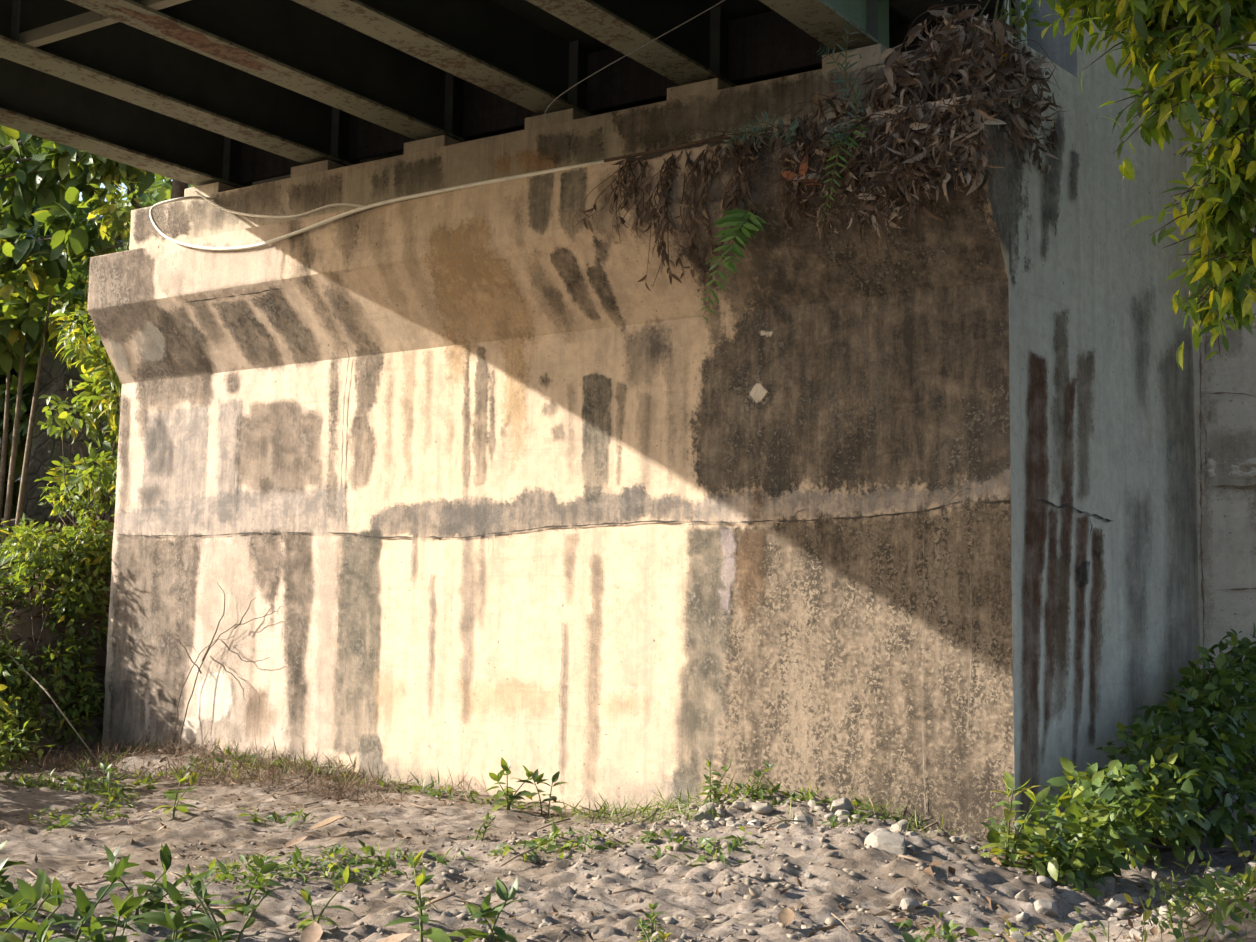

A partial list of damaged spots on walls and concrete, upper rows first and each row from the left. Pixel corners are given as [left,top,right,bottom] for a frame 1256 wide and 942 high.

water stain [133,175,342,244]
water stain [372,157,442,191]
water stain [516,127,603,233]
water stain [291,235,359,333]
water stain [540,237,660,367]
water stain [109,287,1011,806]
crack [113,347,1112,557]
crack [965,563,973,736]
rust [1020,353,1102,830]
crack [1199,313,1256,668]
crack [920,720,928,812]
water stain [860,767,1015,843]